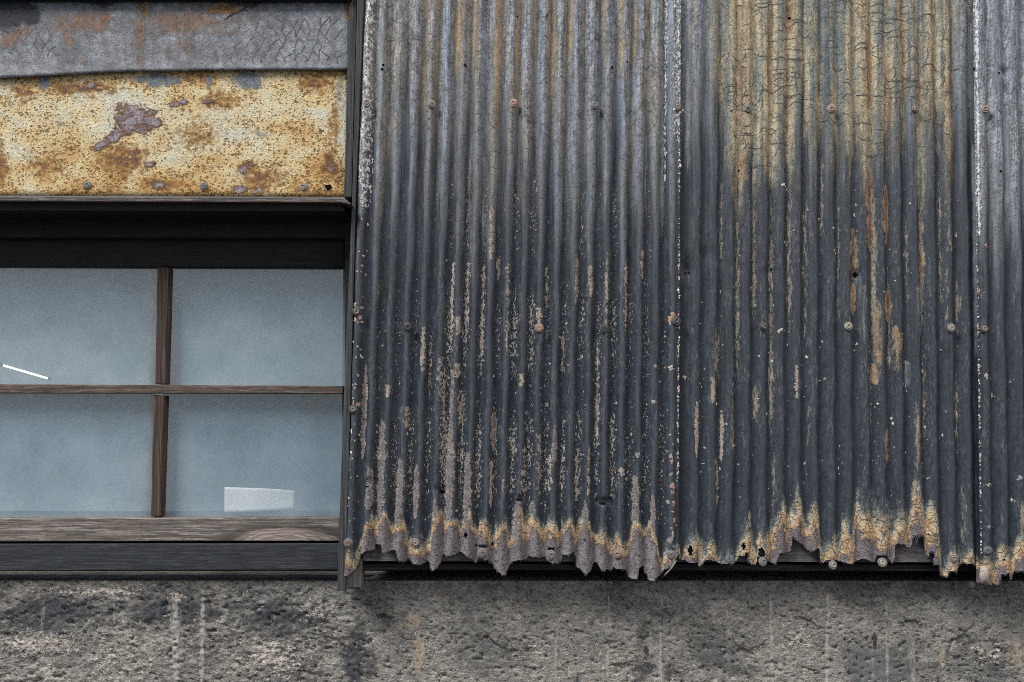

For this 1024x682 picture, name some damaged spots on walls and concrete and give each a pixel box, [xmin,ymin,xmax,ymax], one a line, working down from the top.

rust [0,133,10,185]
rust [5,77,124,104]
rust [96,142,183,191]
rust [168,88,240,161]
rust [230,159,289,193]
rust [297,75,342,179]
rust [713,0,955,315]
peeling [347,159,841,548]
rust [871,291,903,384]
peeling [853,175,963,480]
rust [344,477,1024,588]
peeling [1011,498,1024,541]